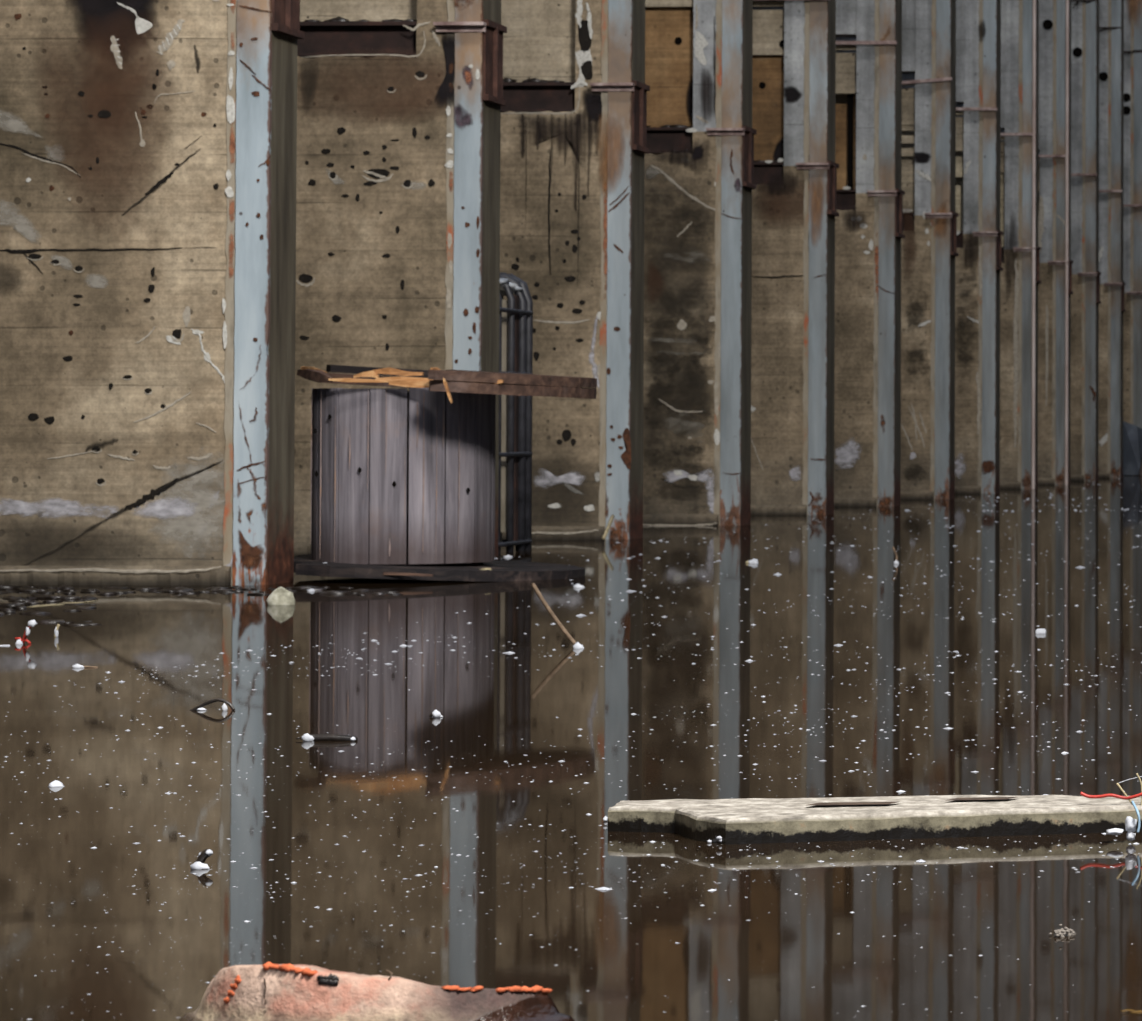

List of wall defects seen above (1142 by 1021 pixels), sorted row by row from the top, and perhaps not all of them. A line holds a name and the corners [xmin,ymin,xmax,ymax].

peeling [503,0,593,115]
water stain [521,113,598,211]
crack [24,460,266,566]
rust [238,503,266,568]